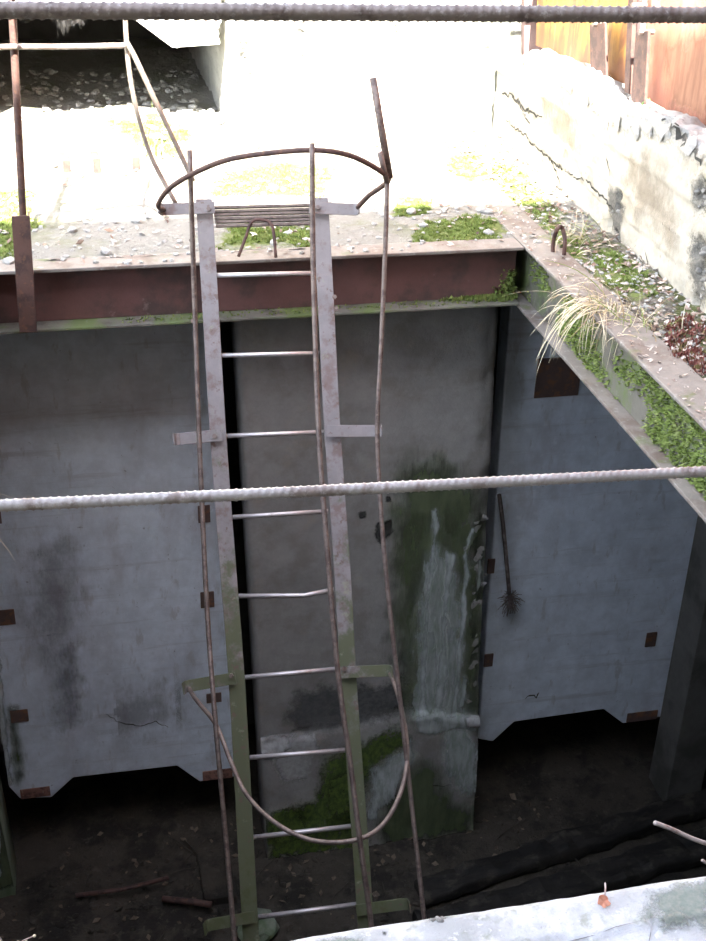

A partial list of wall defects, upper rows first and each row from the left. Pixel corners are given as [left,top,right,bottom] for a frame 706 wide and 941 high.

spalling [393,21,411,32]
spalling [239,20,319,136]
crack [502,92,613,209]
spalling [689,236,706,304]
damp [357,509,482,723]
damp [275,686,342,782]
damp [444,730,477,796]